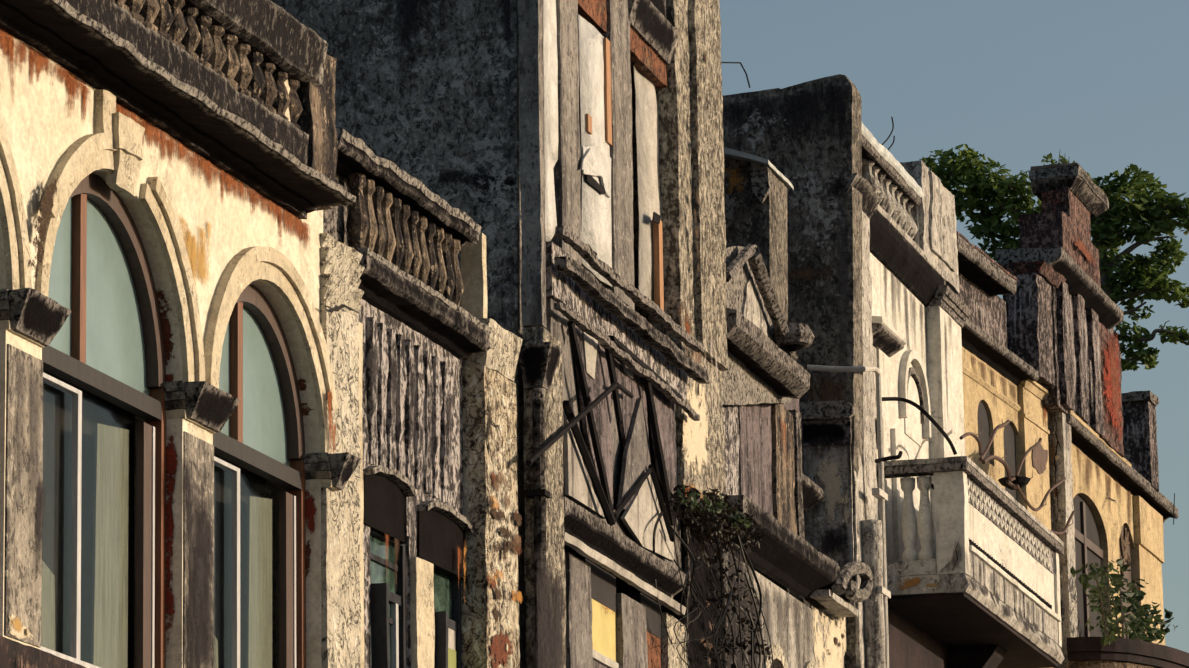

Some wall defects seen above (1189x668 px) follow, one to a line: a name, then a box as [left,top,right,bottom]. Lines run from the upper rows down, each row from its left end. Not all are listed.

rust [0,28,88,120]
rust [116,101,310,245]
flaking render [1103,334,1122,440]
peeling [165,435,178,651]
leakage [182,464,215,668]
peeling [305,491,317,577]
peeling [817,452,849,524]